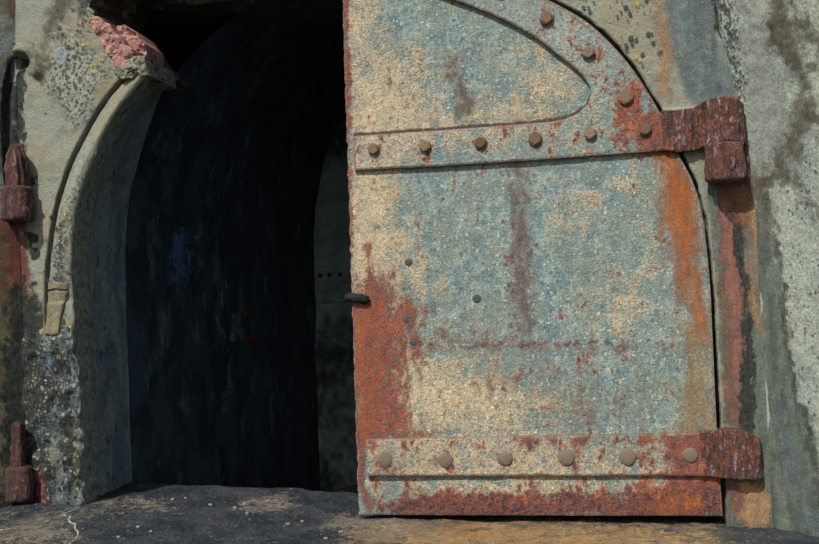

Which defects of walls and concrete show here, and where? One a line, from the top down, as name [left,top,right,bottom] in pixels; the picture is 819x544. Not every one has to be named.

rust [348,152,772,544]